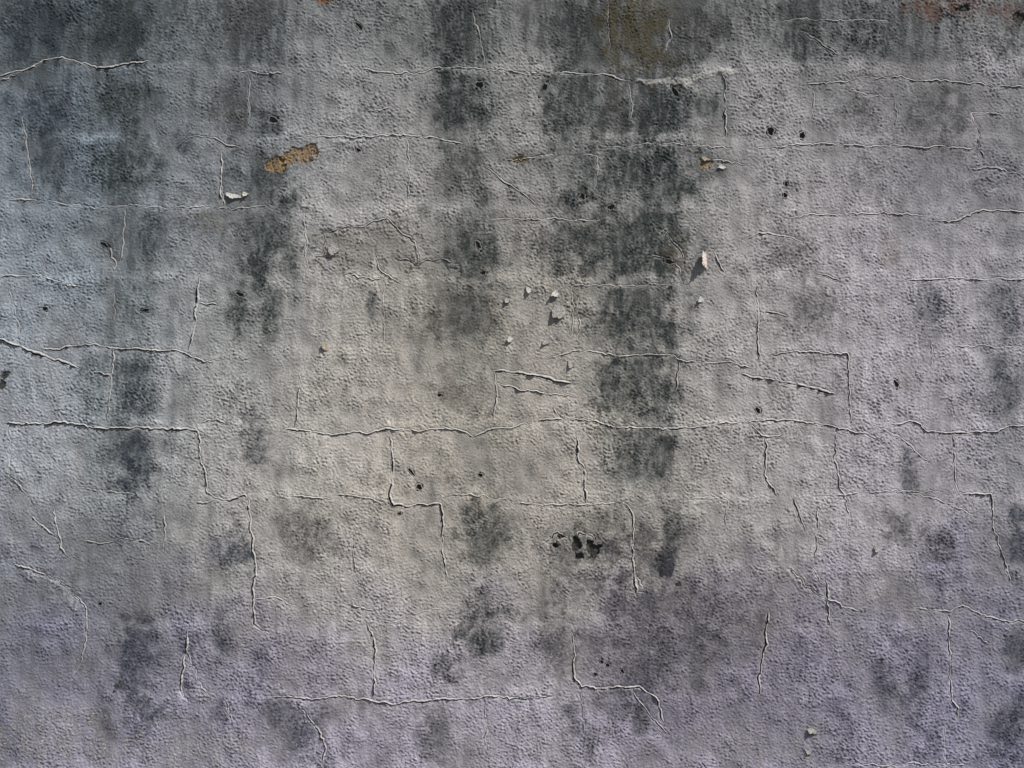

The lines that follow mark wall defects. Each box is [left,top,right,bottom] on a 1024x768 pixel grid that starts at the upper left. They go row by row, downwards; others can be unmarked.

crack [7,70,288,271]
damp [236,215,296,334]
spalling [265,143,318,172]
damp [436,0,484,129]
flaking render [551,289,568,319]
damp [534,2,728,415]
crack [358,0,1024,223]
crack [0,274,298,673]
spalling [544,530,601,559]
crack [281,286,1024,628]
crack [269,604,669,766]
damp [435,605,509,682]